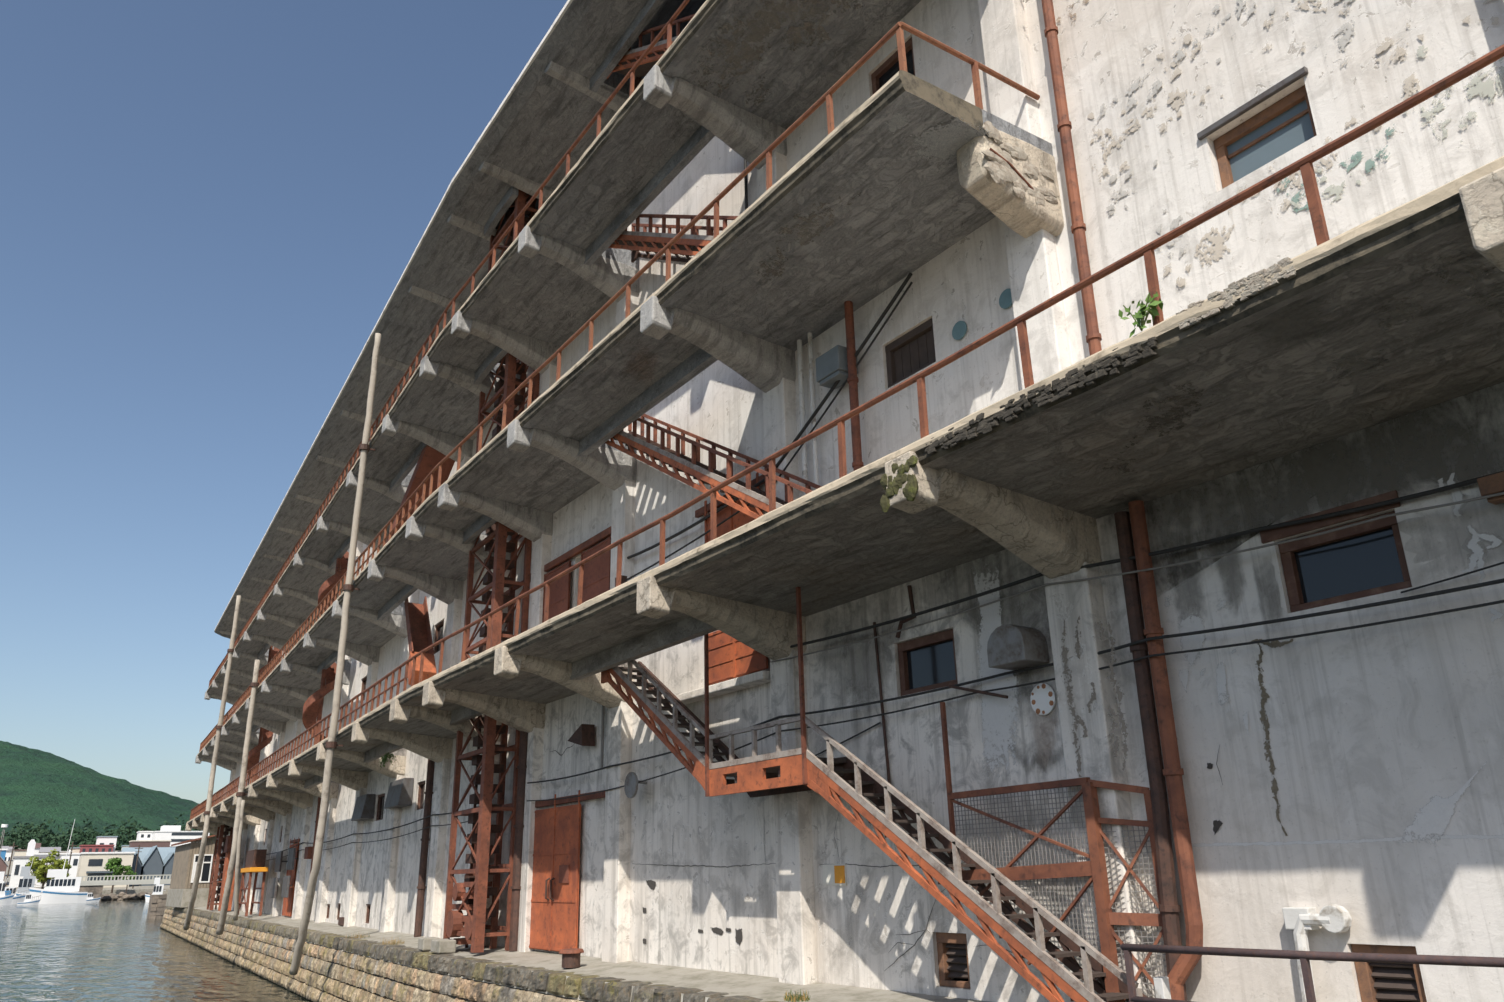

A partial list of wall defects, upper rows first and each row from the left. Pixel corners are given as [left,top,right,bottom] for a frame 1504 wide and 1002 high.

spalling [884,111,1058,206]
peeling [1076,0,1355,216]
spalling [1156,0,1504,330]
spalling [922,336,1158,455]